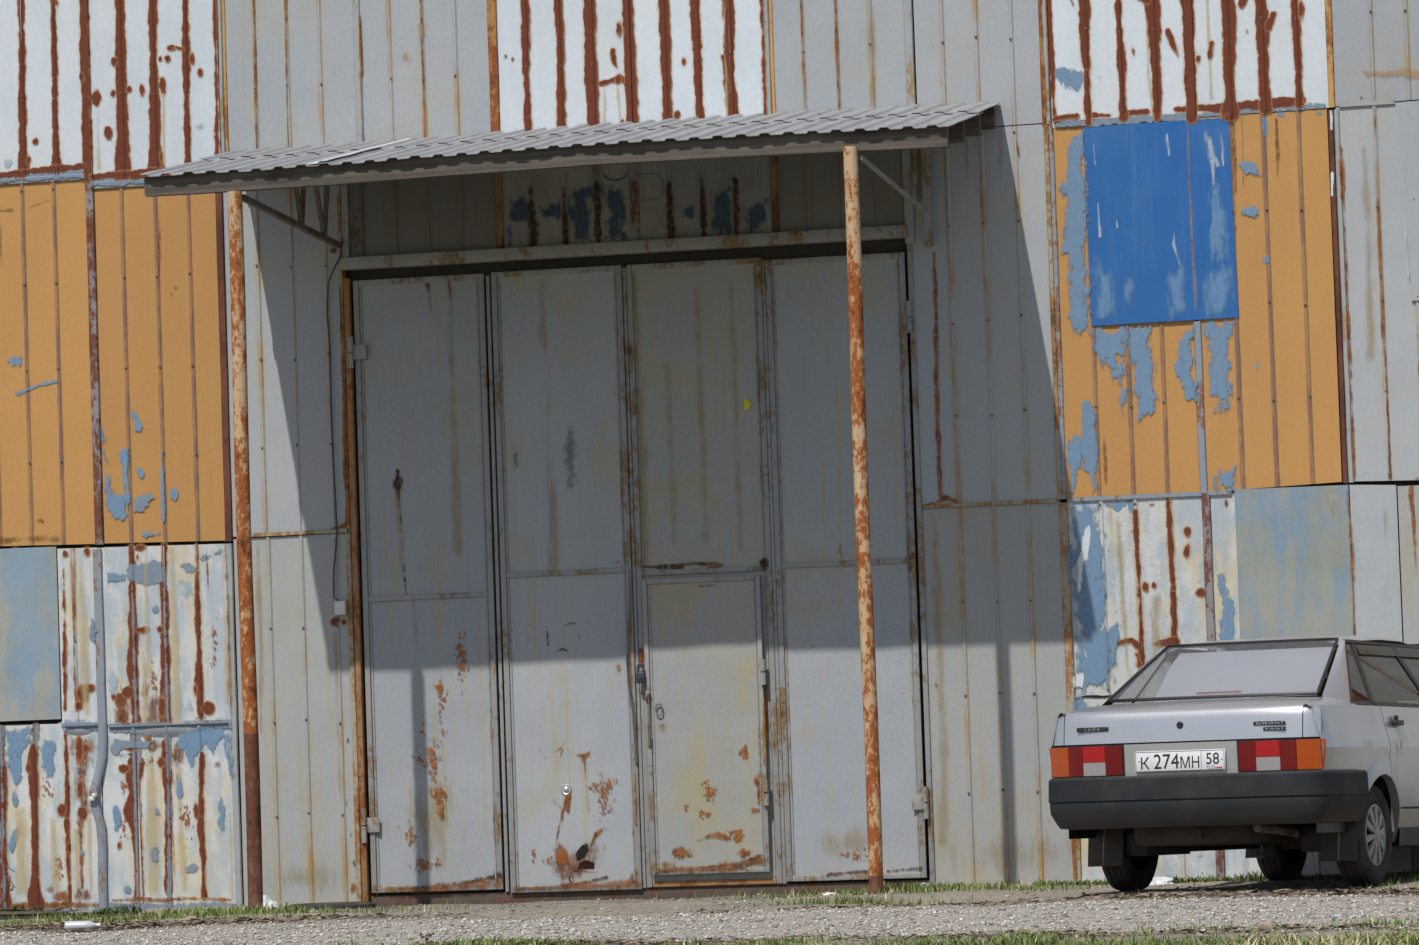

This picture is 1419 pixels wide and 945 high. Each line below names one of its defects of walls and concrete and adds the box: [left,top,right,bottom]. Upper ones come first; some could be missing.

corrosion [0,0,220,183]
corrosion [553,0,567,127]
corrosion [582,0,639,126]
corrosion [658,0,705,120]
corrosion [721,0,739,116]
corrosion [1041,0,1306,194]
peeling [1055,112,1221,422]
peeling [1174,320,1234,413]
peeling [98,426,178,538]
peeling [1066,400,1134,710]
peeling [1217,574,1235,652]
peeling [0,549,234,911]